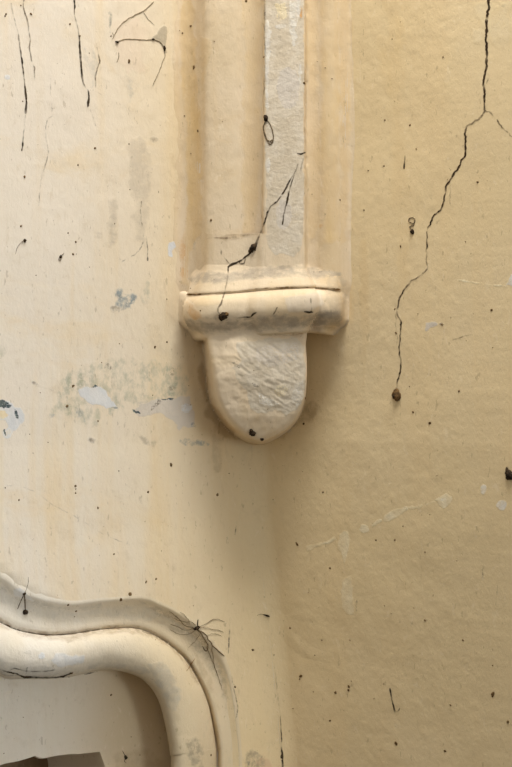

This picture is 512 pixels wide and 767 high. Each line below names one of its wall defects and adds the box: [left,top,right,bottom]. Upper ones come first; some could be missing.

crack [20,41,35,111]
crack [78,35,100,107]
crack [426,0,503,248]
crack [226,179,293,271]
crack [397,269,427,382]
peeling [0,399,25,439]
peeling [78,385,118,409]
peeling [132,396,196,431]